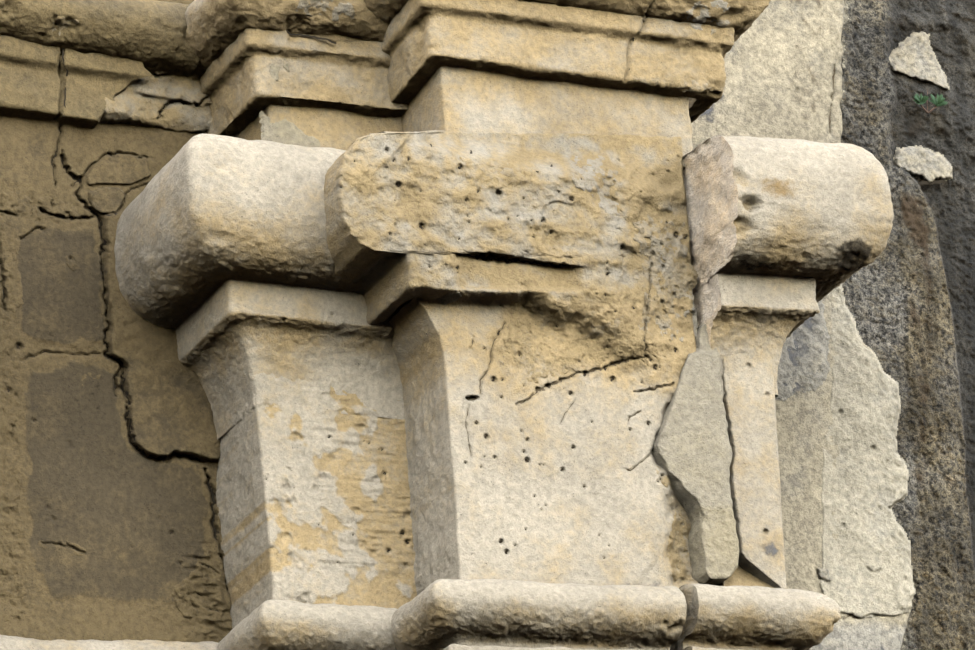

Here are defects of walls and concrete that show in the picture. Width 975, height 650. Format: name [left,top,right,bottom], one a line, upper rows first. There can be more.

crack [0,48,228,612]
crack [466,323,505,452]
crack [519,322,647,403]
flaking render [775,283,916,619]